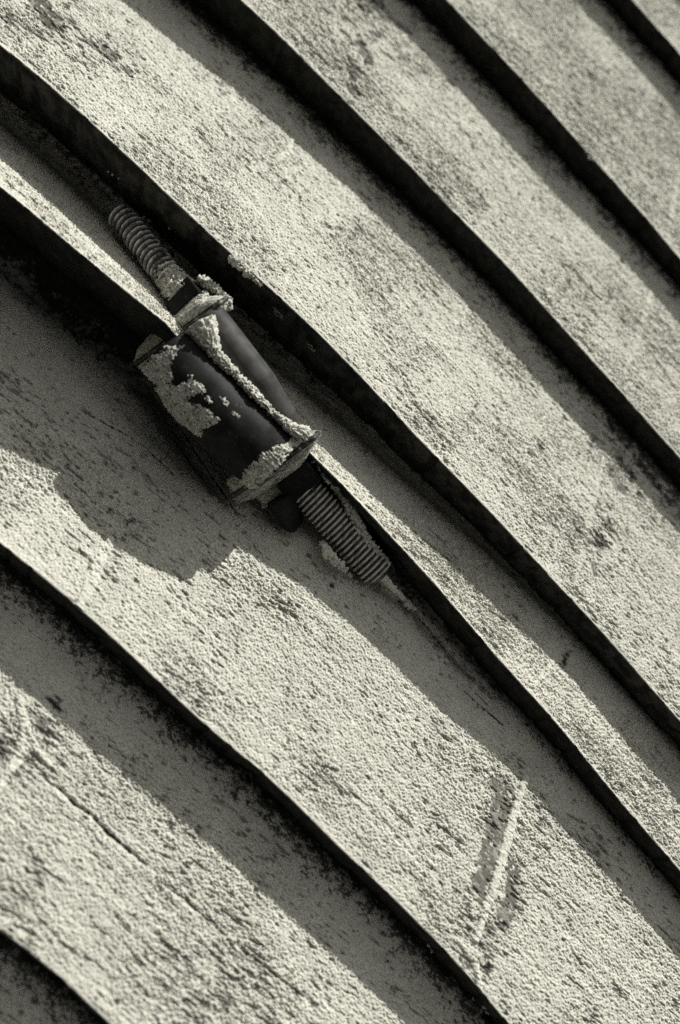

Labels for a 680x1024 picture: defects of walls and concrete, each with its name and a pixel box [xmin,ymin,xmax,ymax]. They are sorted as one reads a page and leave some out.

peeling [141,345,240,437]
peeling [238,440,294,489]